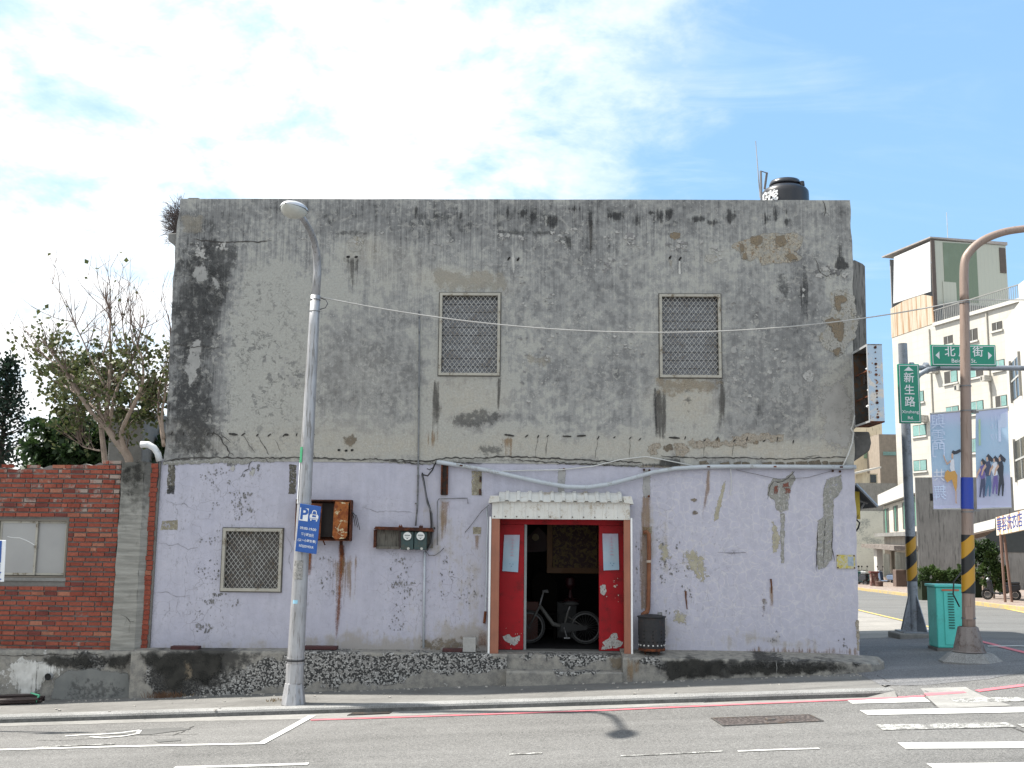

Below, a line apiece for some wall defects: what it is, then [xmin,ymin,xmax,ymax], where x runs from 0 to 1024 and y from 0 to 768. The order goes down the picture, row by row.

spalling [665,232,803,266]
spalling [815,263,861,357]
damp [654,391,666,434]
spalling [641,433,844,570]
corrosion [337,545,356,629]
peeling [658,541,709,598]
peeling [503,633,522,646]
peeling [601,633,623,650]